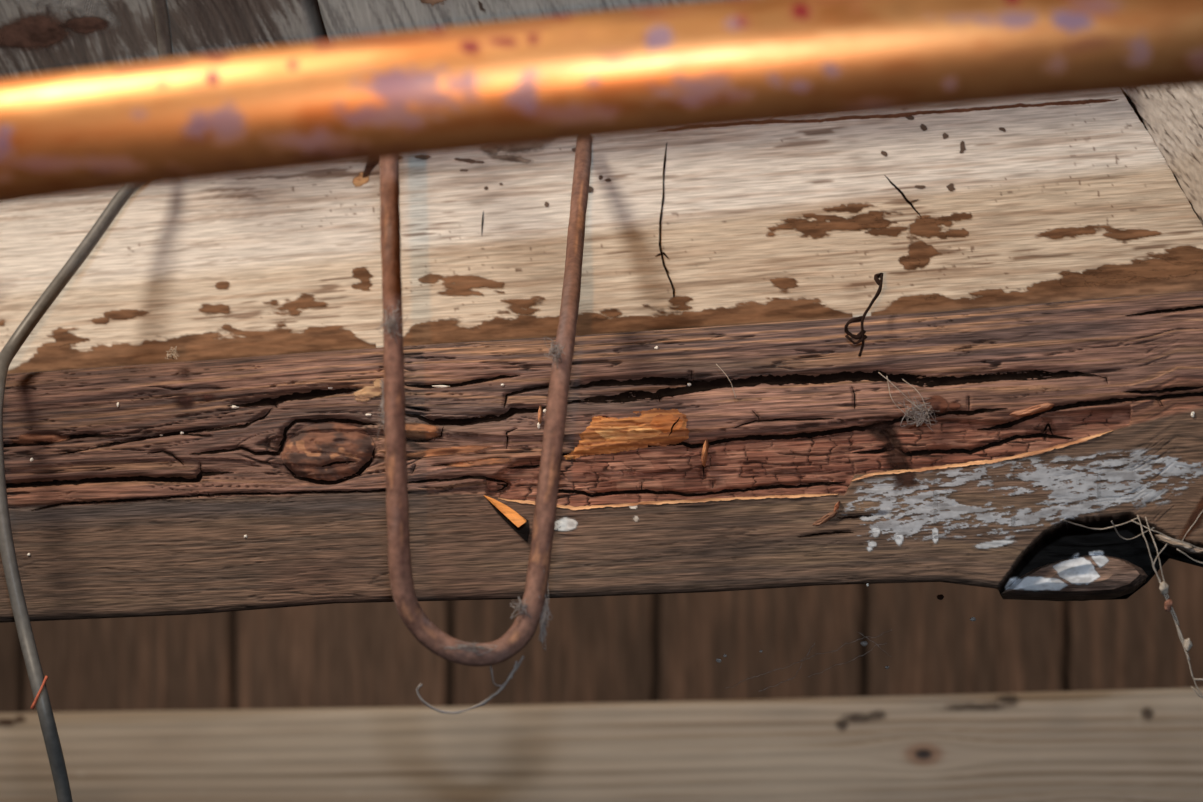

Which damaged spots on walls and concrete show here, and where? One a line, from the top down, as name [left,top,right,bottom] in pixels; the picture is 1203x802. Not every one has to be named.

crack [3,370,1203,511]
peeling [595,414,683,440]
leakage [868,421,915,487]
crack [798,513,891,537]